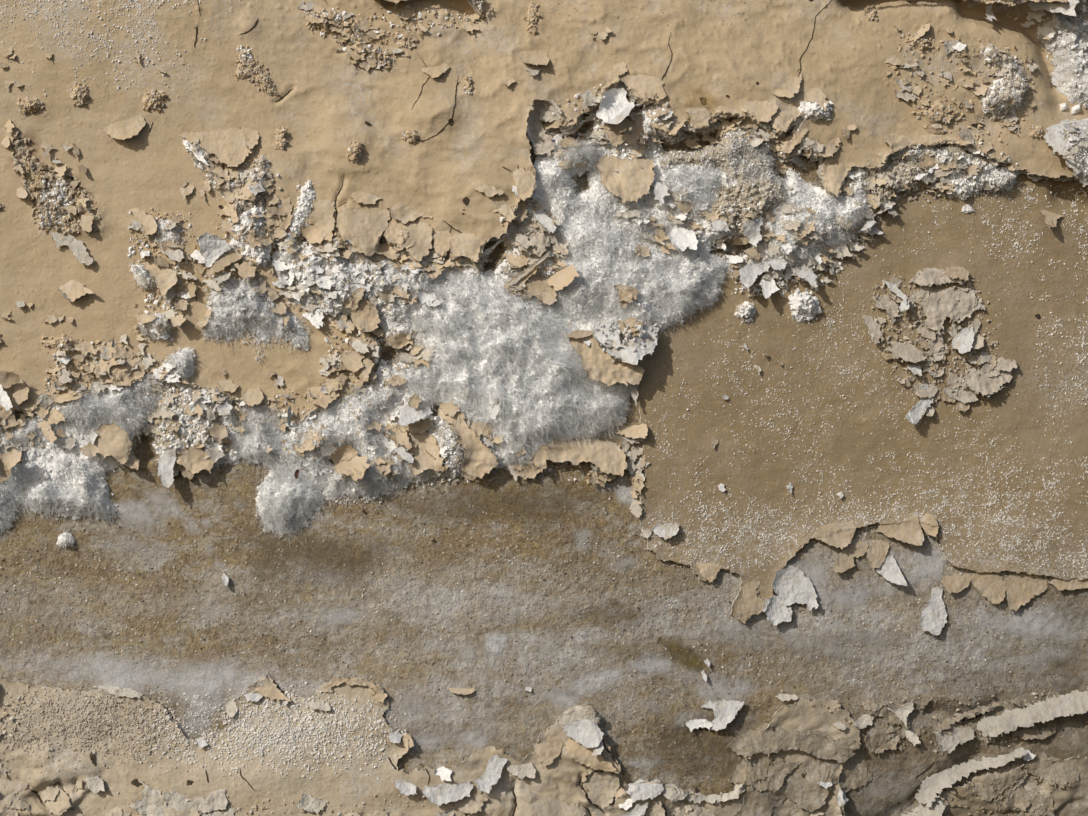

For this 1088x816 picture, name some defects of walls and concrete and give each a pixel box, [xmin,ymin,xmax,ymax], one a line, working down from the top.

leakage [908,34,931,52]
leakage [16,96,45,115]
leakage [70,82,89,107]
leakage [953,44,1032,121]
leakage [1030,0,1088,177]
peeling [0,120,679,540]
leakage [0,99,1019,582]
peeling [861,266,1018,424]
peeling [813,513,939,586]
peeling [735,564,819,626]
peeling [920,572,1088,635]
peeling [41,688,1088,816]